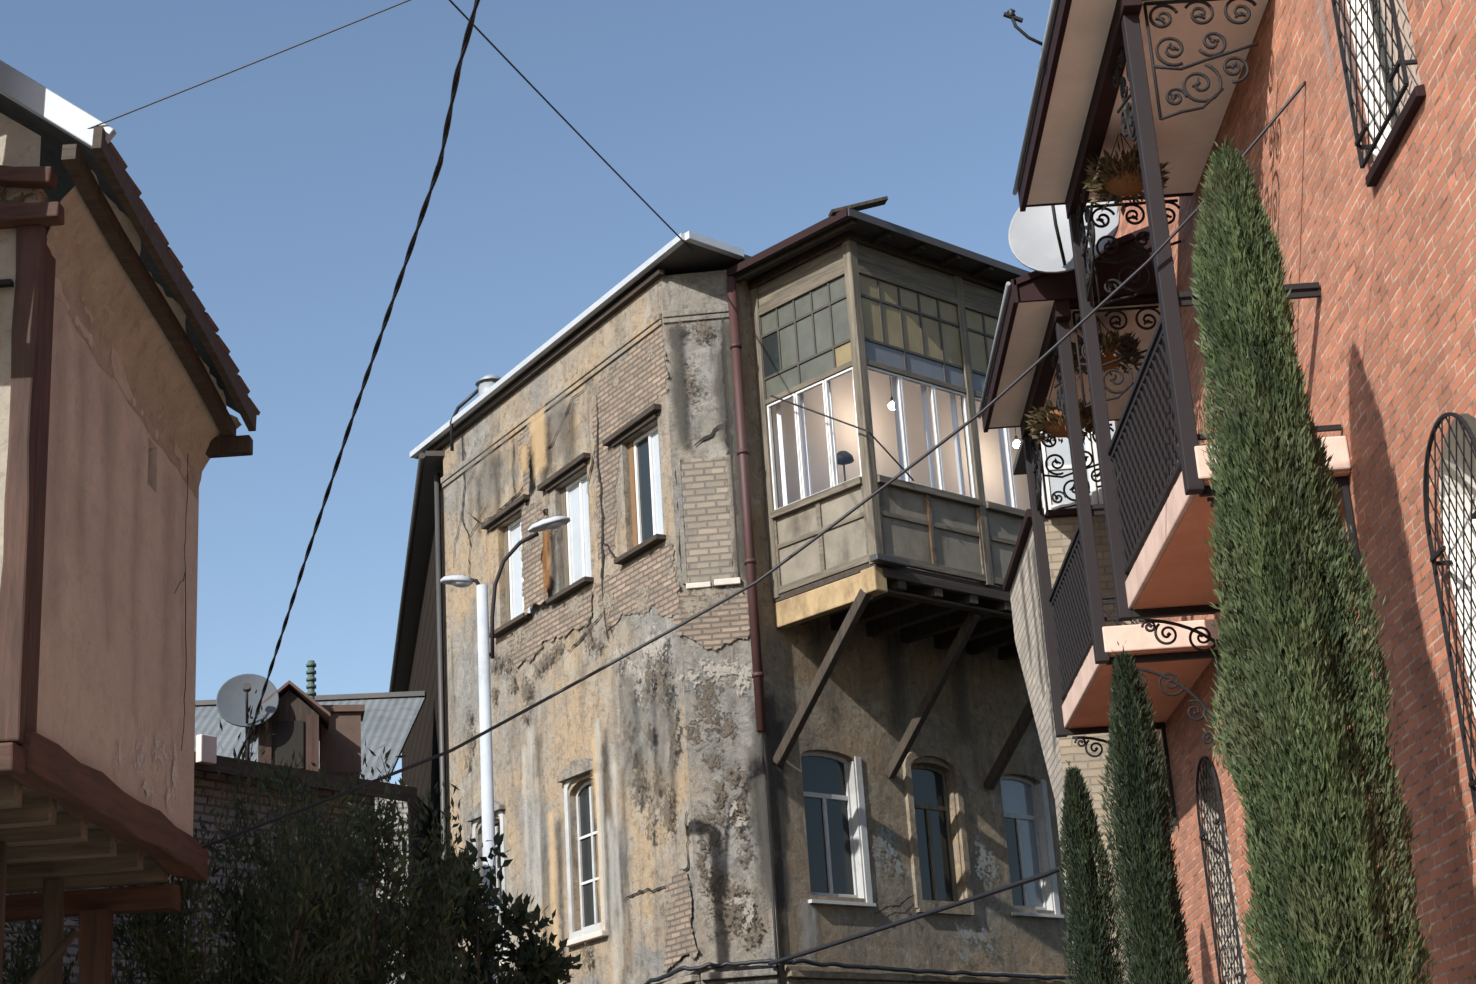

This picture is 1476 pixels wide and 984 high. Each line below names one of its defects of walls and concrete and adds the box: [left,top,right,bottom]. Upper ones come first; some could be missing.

crack [174,453,189,751]
crack [453,378,617,651]
flaking render [490,325,767,974]